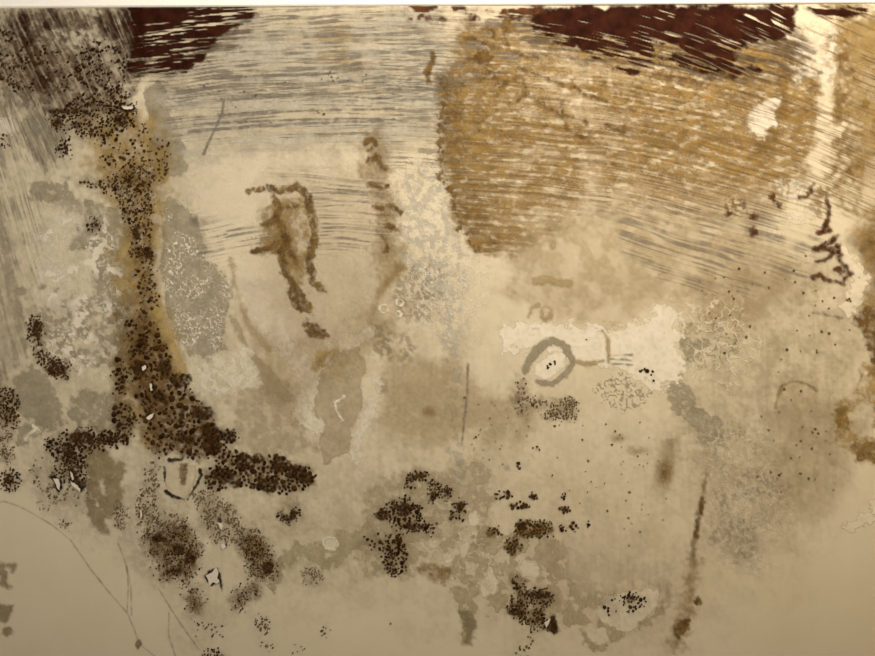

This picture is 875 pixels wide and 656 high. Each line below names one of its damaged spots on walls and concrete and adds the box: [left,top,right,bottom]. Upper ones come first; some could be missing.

water stain [436,5,875,256]
corrosion [246,183,329,339]
corrosion [726,202,758,236]
corrosion [811,198,853,284]
water stain [0,29,317,656]
water stain [507,336,610,427]
corrosion [835,306,875,463]
water stain [363,470,468,577]
water stain [486,490,591,555]
peeling [205,568,222,588]
water stain [506,575,555,656]
corrosion [674,576,702,639]